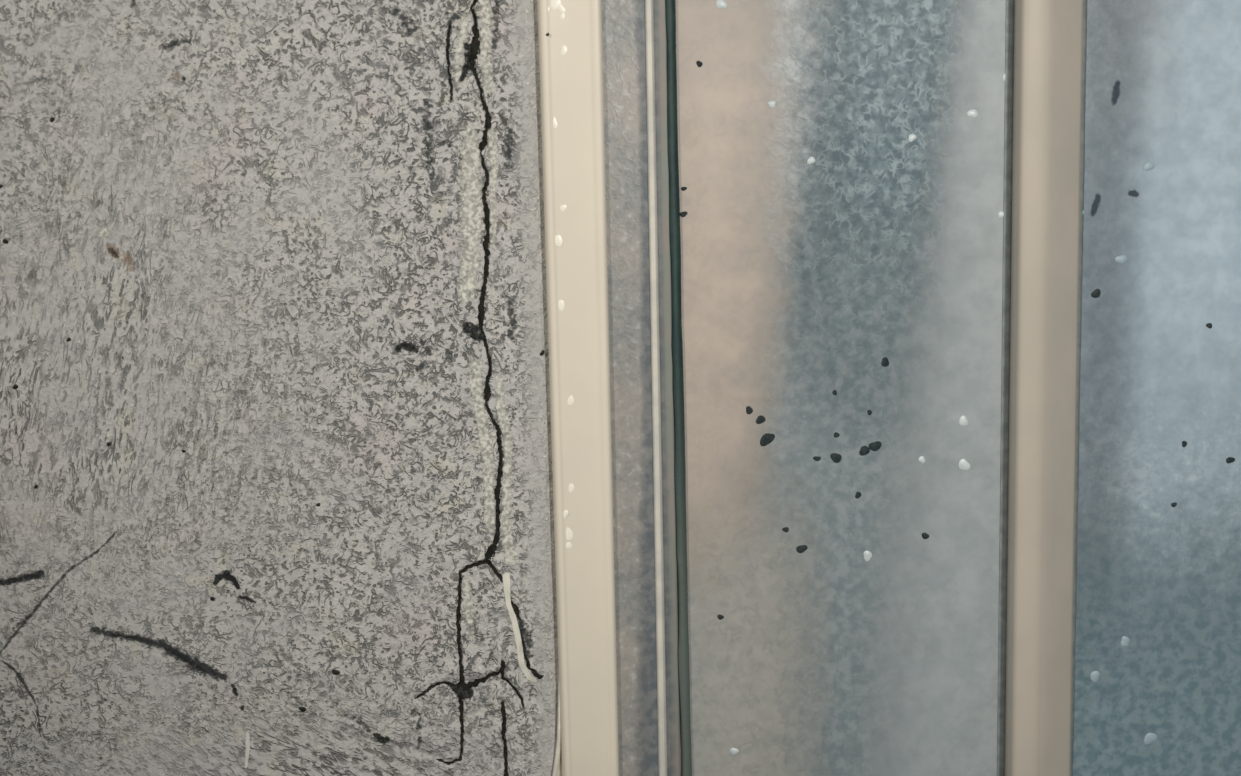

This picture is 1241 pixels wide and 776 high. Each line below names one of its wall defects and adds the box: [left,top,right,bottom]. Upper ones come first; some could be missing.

crack [0,531,117,737]
crack [414,0,543,776]